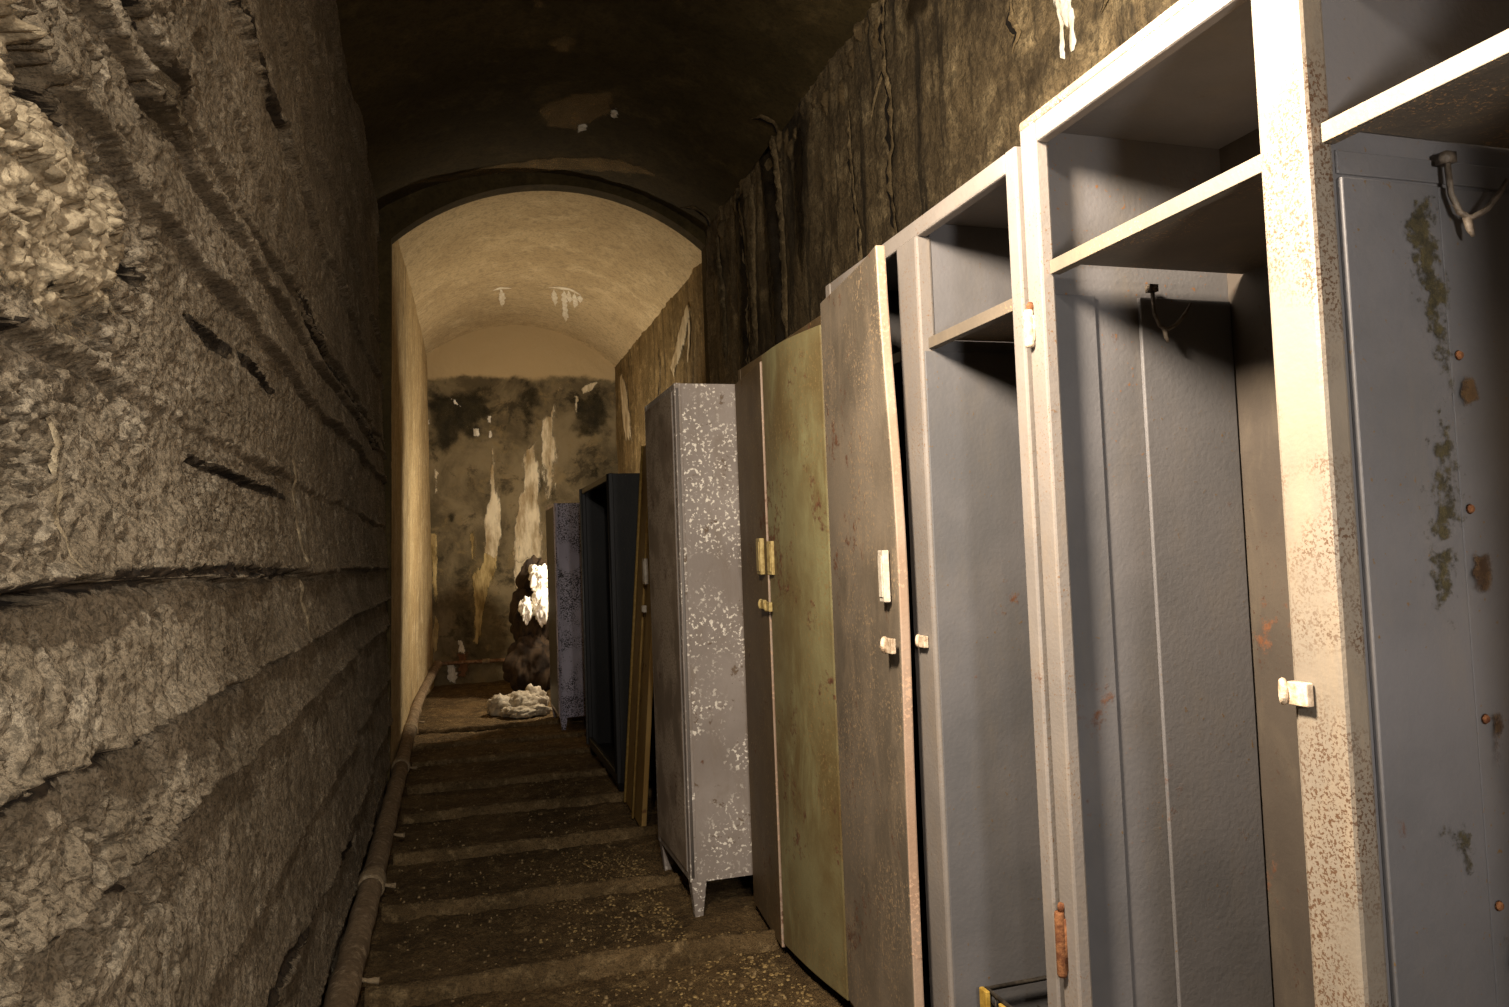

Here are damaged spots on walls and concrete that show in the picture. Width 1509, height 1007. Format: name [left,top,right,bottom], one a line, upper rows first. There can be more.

water stain [1055,0,1076,59]
water stain [430,388,487,450]
water stain [470,373,631,644]
water stain [431,533,439,653]